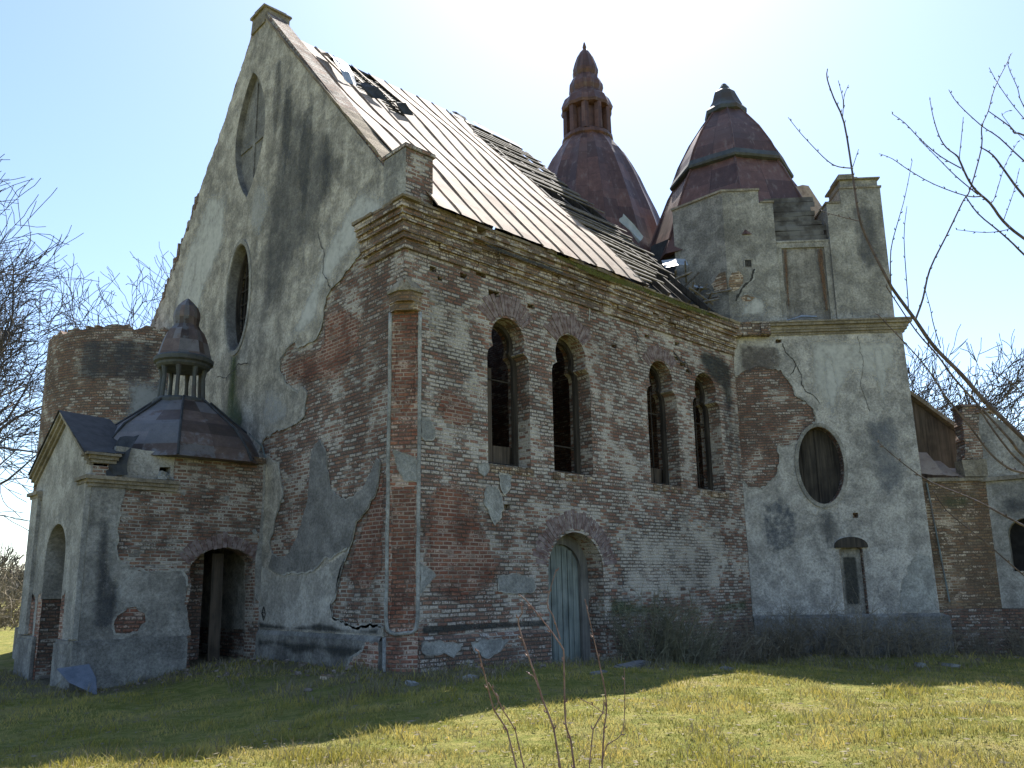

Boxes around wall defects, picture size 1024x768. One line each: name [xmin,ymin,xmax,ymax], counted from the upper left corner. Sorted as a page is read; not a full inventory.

water stain [296,195,381,332]
crack [735,269,757,301]
spalling [253,249,512,671]
spalling [735,341,817,490]
crack [782,343,819,402]
spalling [115,489,257,587]
water stain [765,503,794,550]
spalling [111,605,148,637]